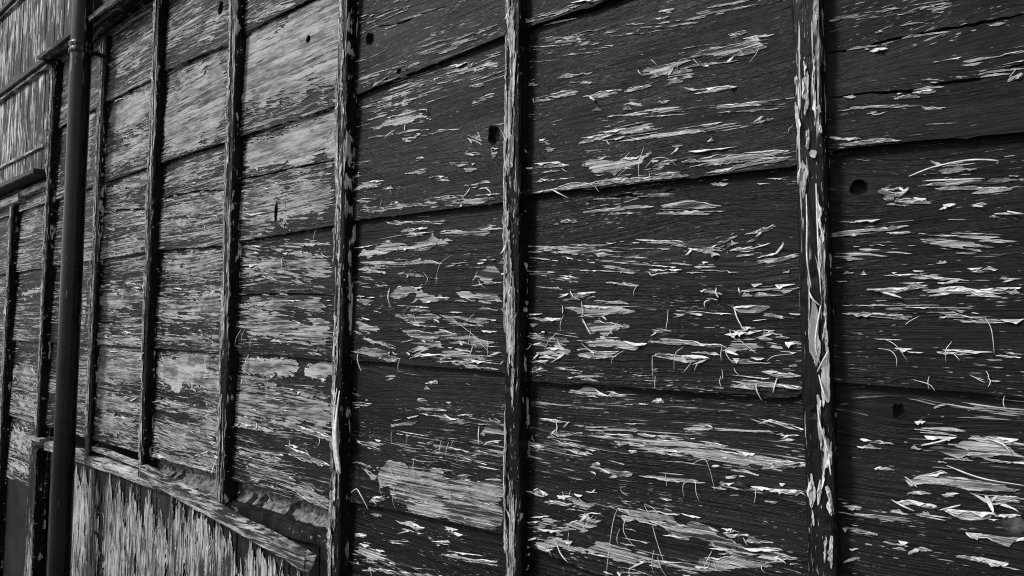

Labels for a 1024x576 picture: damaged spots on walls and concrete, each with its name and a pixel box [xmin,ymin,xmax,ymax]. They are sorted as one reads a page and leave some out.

peeling [530,0,757,62]
peeling [812,0,953,36]
crack [830,13,1024,53]
crack [831,64,1024,98]
peeling [71,0,600,576]
peeling [526,30,1024,576]